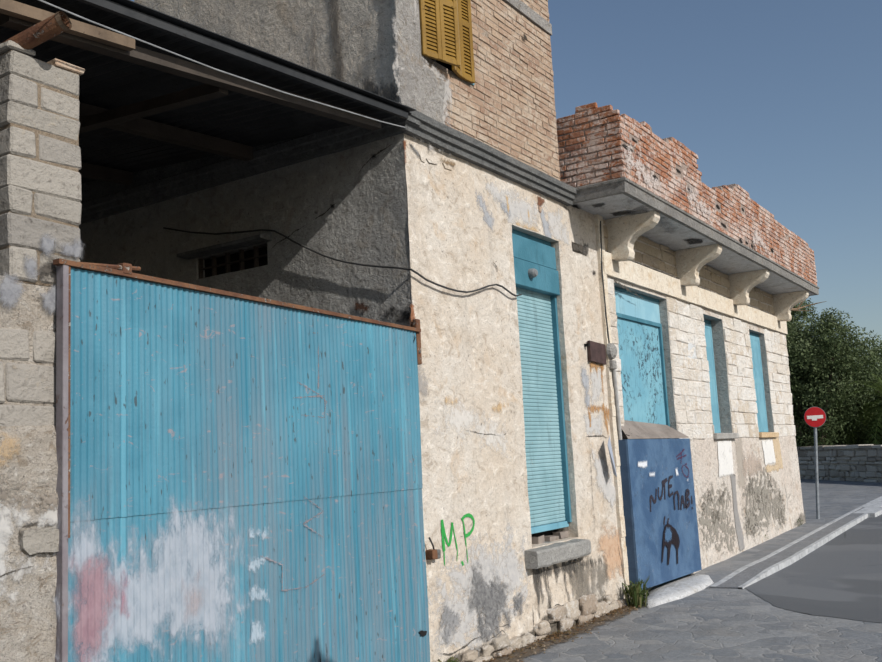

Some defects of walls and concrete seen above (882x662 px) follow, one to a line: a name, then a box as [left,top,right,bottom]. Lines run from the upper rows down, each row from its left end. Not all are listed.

water stain [329,0,344,81]
peeling [476,193,494,231]
peeling [538,196,552,238]
rust [588,403,609,432]
water stain [440,567,523,645]
water stain [533,556,608,617]